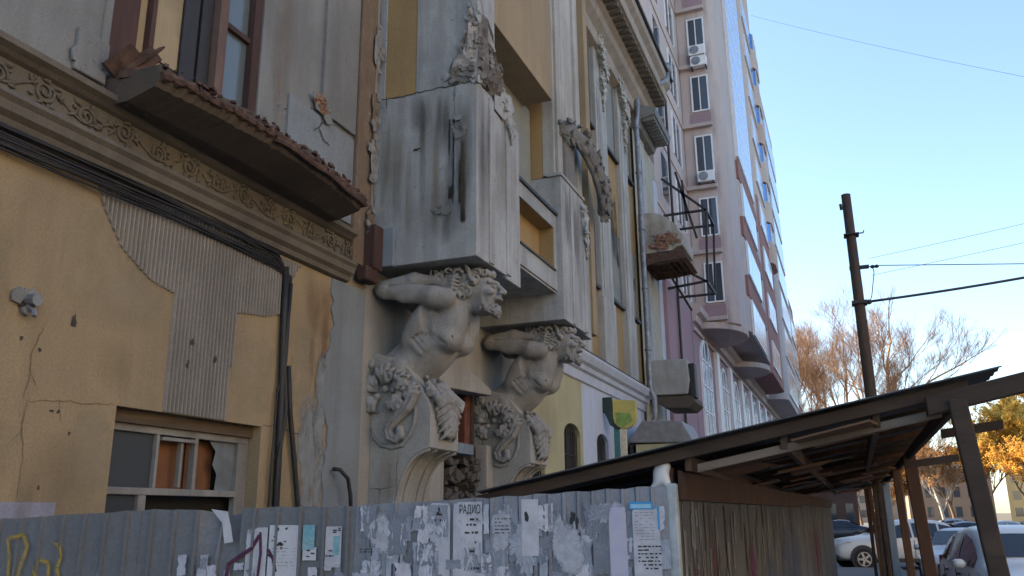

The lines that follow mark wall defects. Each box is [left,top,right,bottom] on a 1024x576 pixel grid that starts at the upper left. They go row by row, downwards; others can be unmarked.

flaking render [368,135,380,185]
crack [382,81,470,146]
spalling [441,0,514,121]
crack [11,328,114,493]
peeling [297,358,326,507]